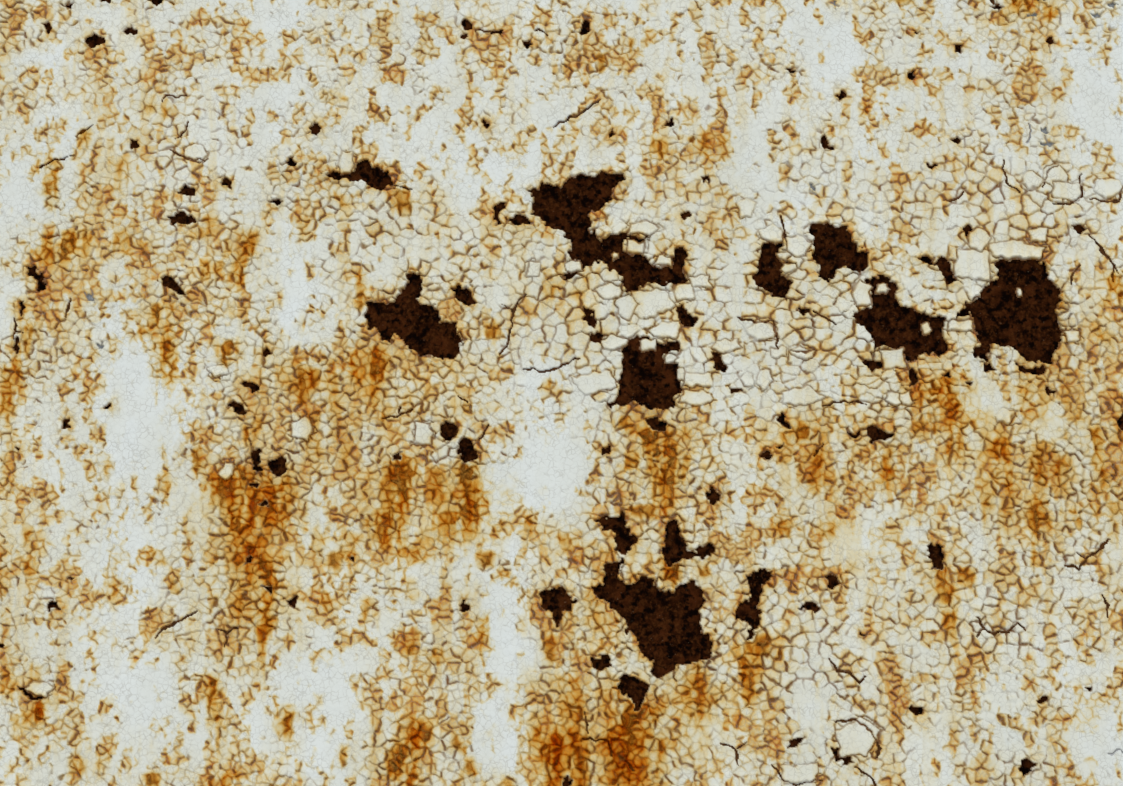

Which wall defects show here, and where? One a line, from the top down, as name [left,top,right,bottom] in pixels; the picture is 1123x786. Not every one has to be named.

crack [1002,160,1122,205]
rust [46,234,76,260]
crack [1070,234,1119,285]
peeling [355,257,487,368]
crack [499,294,581,373]
peeling [480,164,826,439]
peeling [739,215,1081,452]
rust [382,461,413,502]
rust [451,466,479,522]
crack [1064,539,1111,571]
peeling [525,472,737,721]
rust [611,706,646,775]